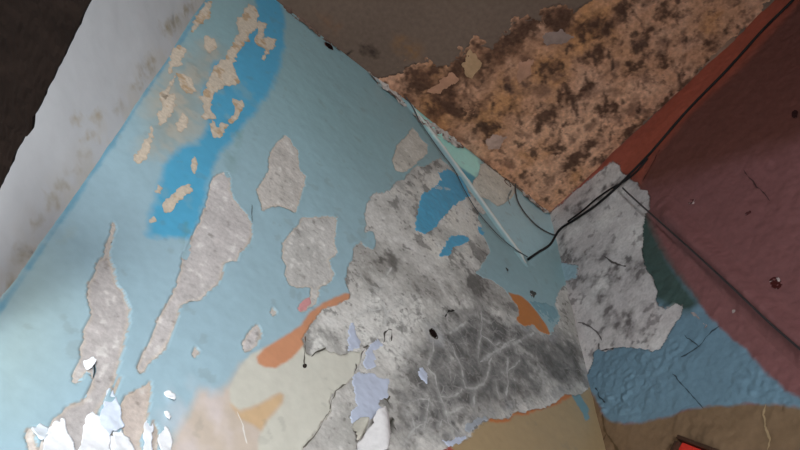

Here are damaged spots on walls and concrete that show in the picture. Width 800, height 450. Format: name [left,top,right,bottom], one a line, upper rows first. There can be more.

peeling [133,1,277,164]
peeling [25,222,173,450]
peeling [138,172,252,373]
peeling [242,325,261,352]
peeling [257,135,337,312]
flaking render [303,0,770,450]